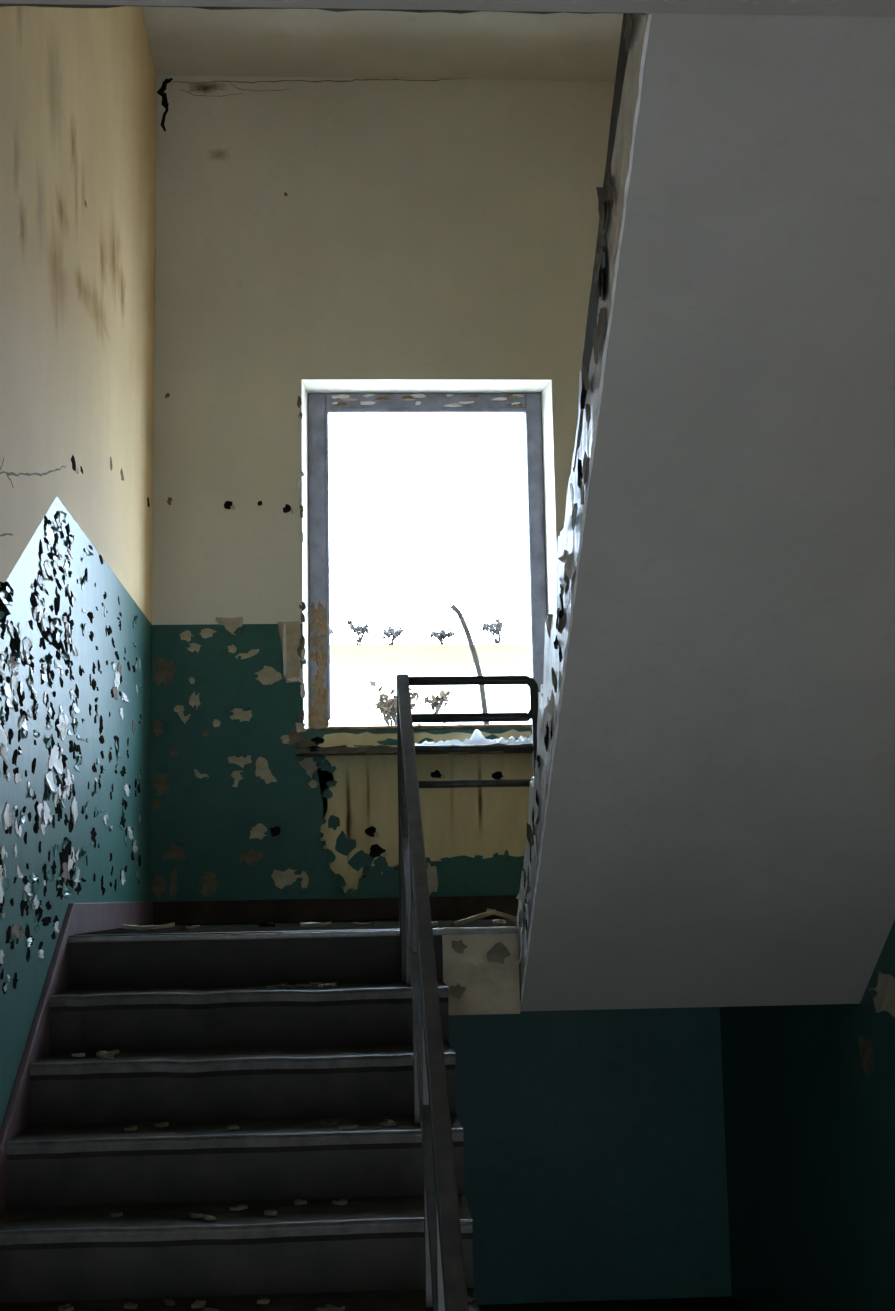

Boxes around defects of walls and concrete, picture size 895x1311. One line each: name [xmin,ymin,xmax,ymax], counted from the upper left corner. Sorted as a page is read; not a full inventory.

crack [157,78,451,132]
crack [0,458,66,487]
flaking render [283,470,304,542]
peeling [0,511,399,995]
peeling [414,550,575,999]